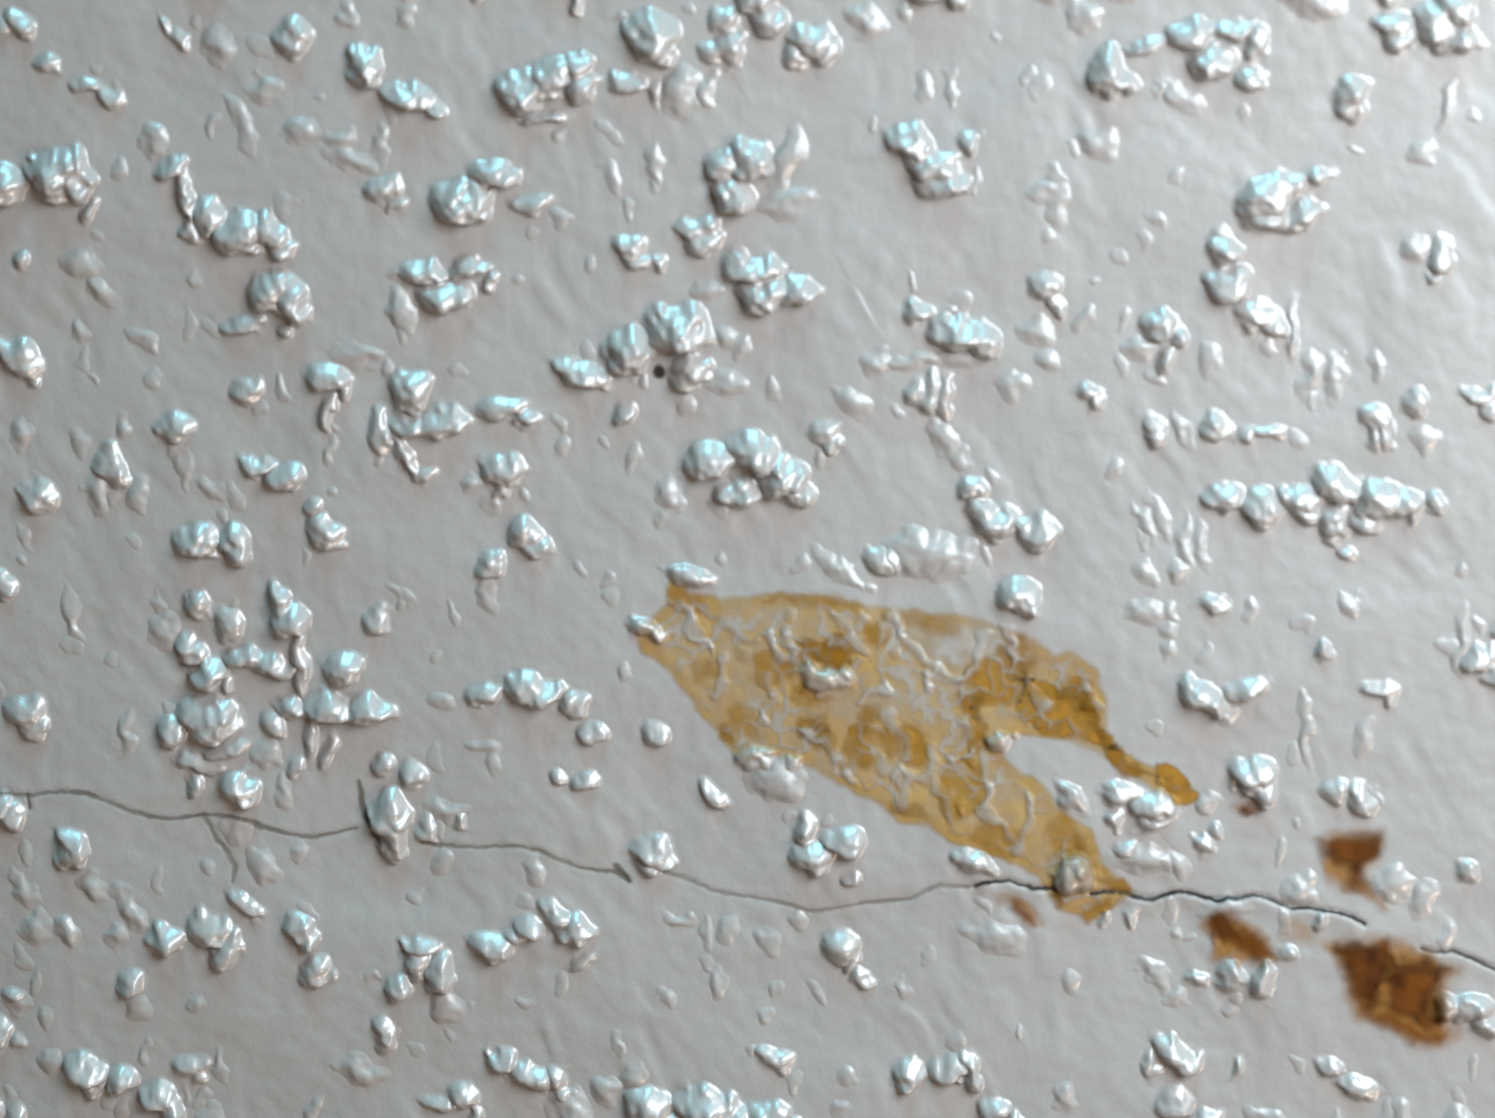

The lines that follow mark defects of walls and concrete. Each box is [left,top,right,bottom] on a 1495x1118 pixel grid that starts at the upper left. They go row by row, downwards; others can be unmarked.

leakage [638,582,1199,921]
crack [74,790,96,798]
crack [147,813,273,830]
crack [341,783,381,844]
crack [604,864,631,882]
corrosion [1325,836,1379,889]
crack [974,879,1366,926]
corrosion [1207,914,1271,961]
crack [1421,947,1495,971]
corrosion [1329,940,1450,1044]